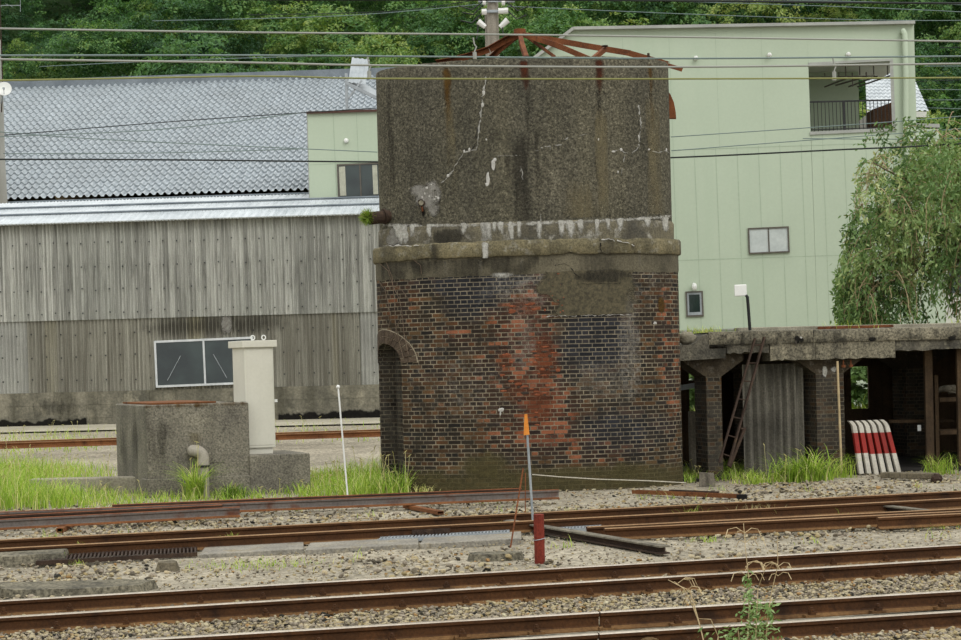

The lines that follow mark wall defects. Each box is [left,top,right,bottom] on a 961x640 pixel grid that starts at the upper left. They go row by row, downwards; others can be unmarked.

crack [441,76,487,183]
crack [500,105,670,179]
spalling [412,181,440,216]
spalling [498,342,560,426]